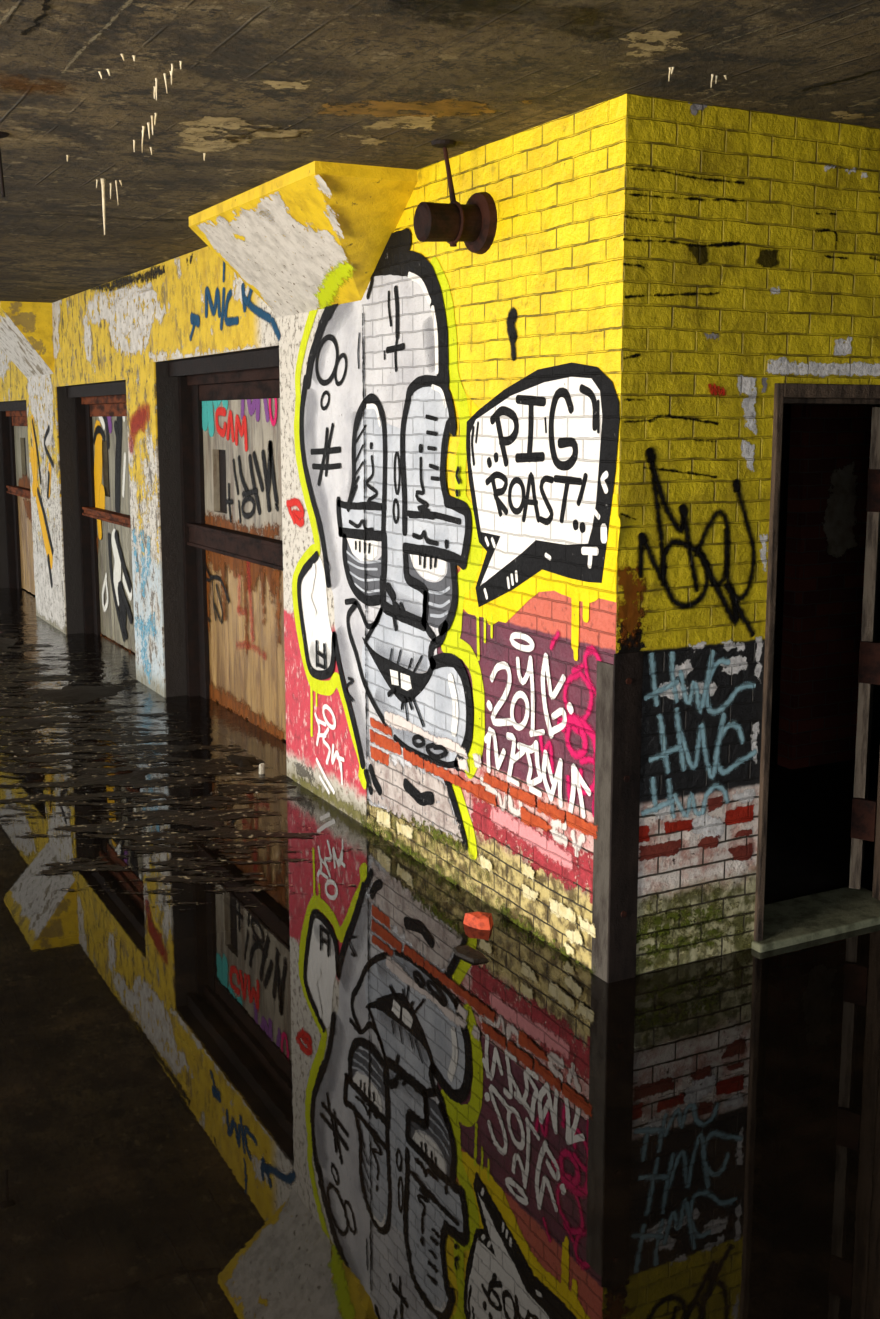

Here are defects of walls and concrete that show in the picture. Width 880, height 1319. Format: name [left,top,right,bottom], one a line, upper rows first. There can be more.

crack [21,0,51,35]
peeling [263,80,311,90]
peeling [172,113,314,153]
peeling [317,99,496,146]
peeling [824,165,868,179]
peeling [196,174,348,318]
peeling [52,300,62,359]
peeling [83,282,278,364]
peeling [737,336,880,472]
peeling [759,534,768,572]
peeling [658,636,764,700]
peeling [750,721,760,764]